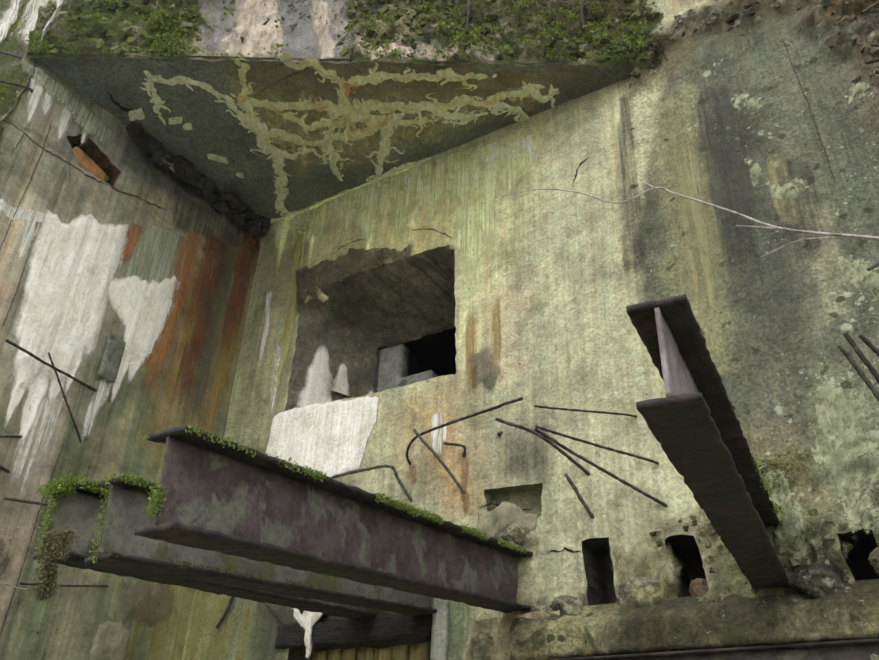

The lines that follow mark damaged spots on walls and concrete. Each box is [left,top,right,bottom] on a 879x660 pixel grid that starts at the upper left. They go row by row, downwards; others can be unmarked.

crack [1,222,38,330]
crack [0,119,166,250]
rust [121,223,141,261]
rust [146,231,200,385]
water stain [128,52,559,280]
spalling [295,244,411,313]
water stain [620,98,641,216]
water stain [673,92,752,312]
spalling [5,339,97,443]
crack [0,443,65,636]
spalling [332,464,413,502]
spalling [405,397,668,507]